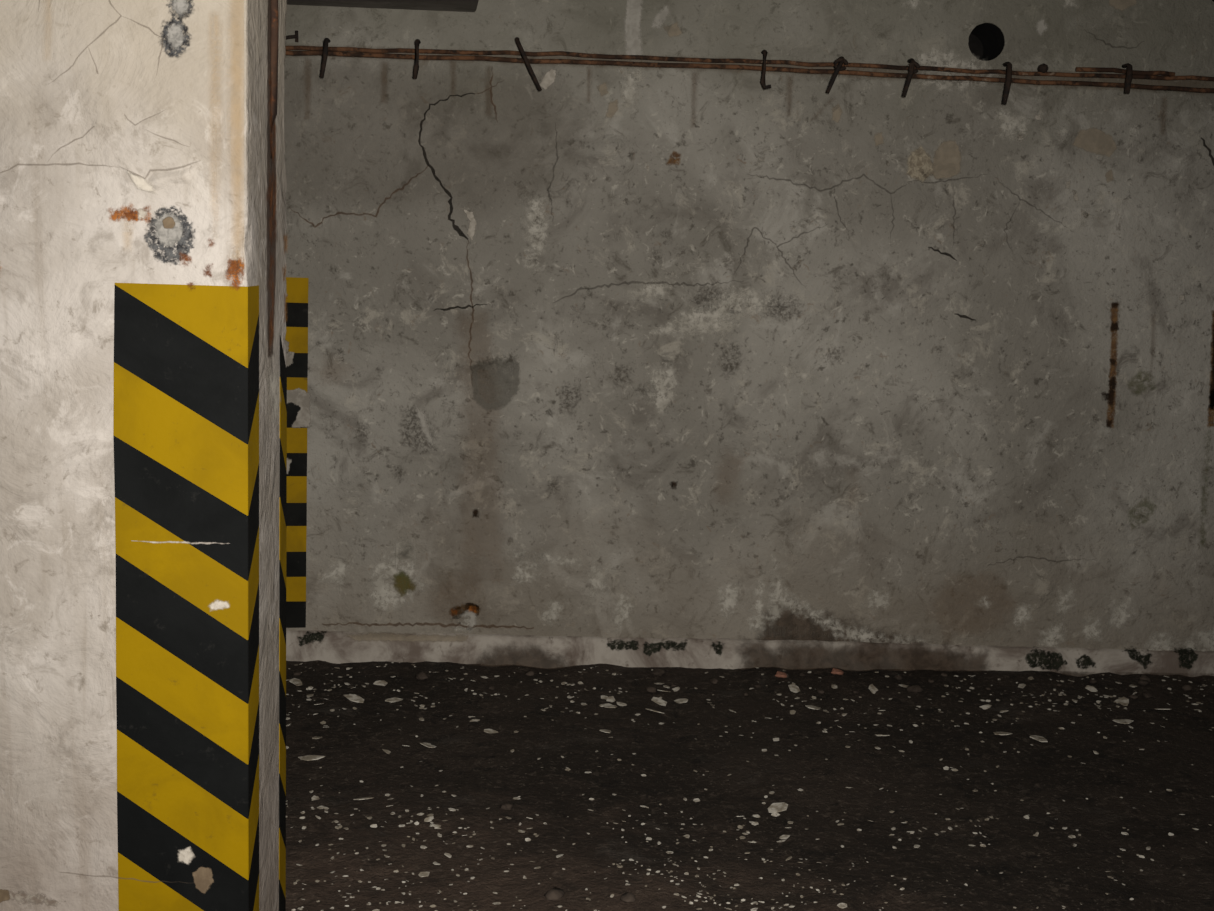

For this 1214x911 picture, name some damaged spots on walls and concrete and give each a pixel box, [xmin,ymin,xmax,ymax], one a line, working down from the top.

crack [418,93,475,240]
rust [267,0,287,357]
rust [110,206,150,222]
rust [1102,303,1118,427]
leakage [742,567,986,671]
peeling [1026,649,1095,671]
peeling [1125,648,1152,669]
peeling [1174,648,1198,669]
spalling [0,889,58,906]